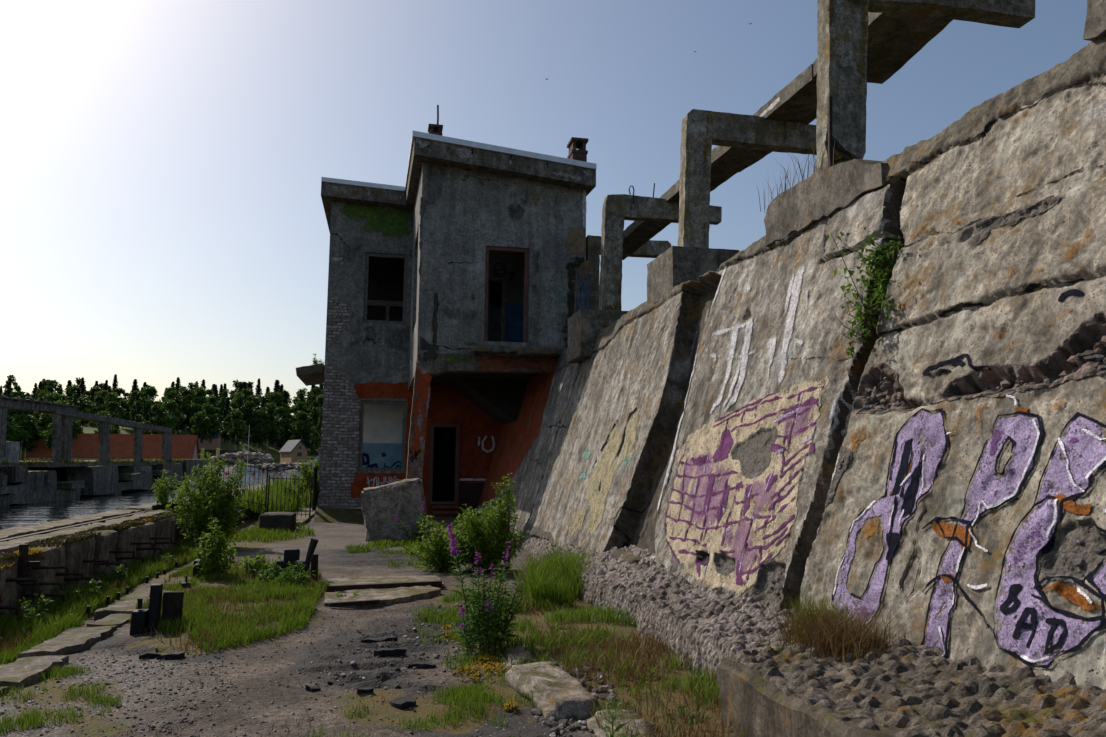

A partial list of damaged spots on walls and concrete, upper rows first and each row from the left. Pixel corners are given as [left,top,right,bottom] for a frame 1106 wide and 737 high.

crack [868,81,1106,194]
peeling [318,297,362,508]
crack [528,290,705,521]
spalling [853,311,1106,414]
crack [877,279,1084,337]